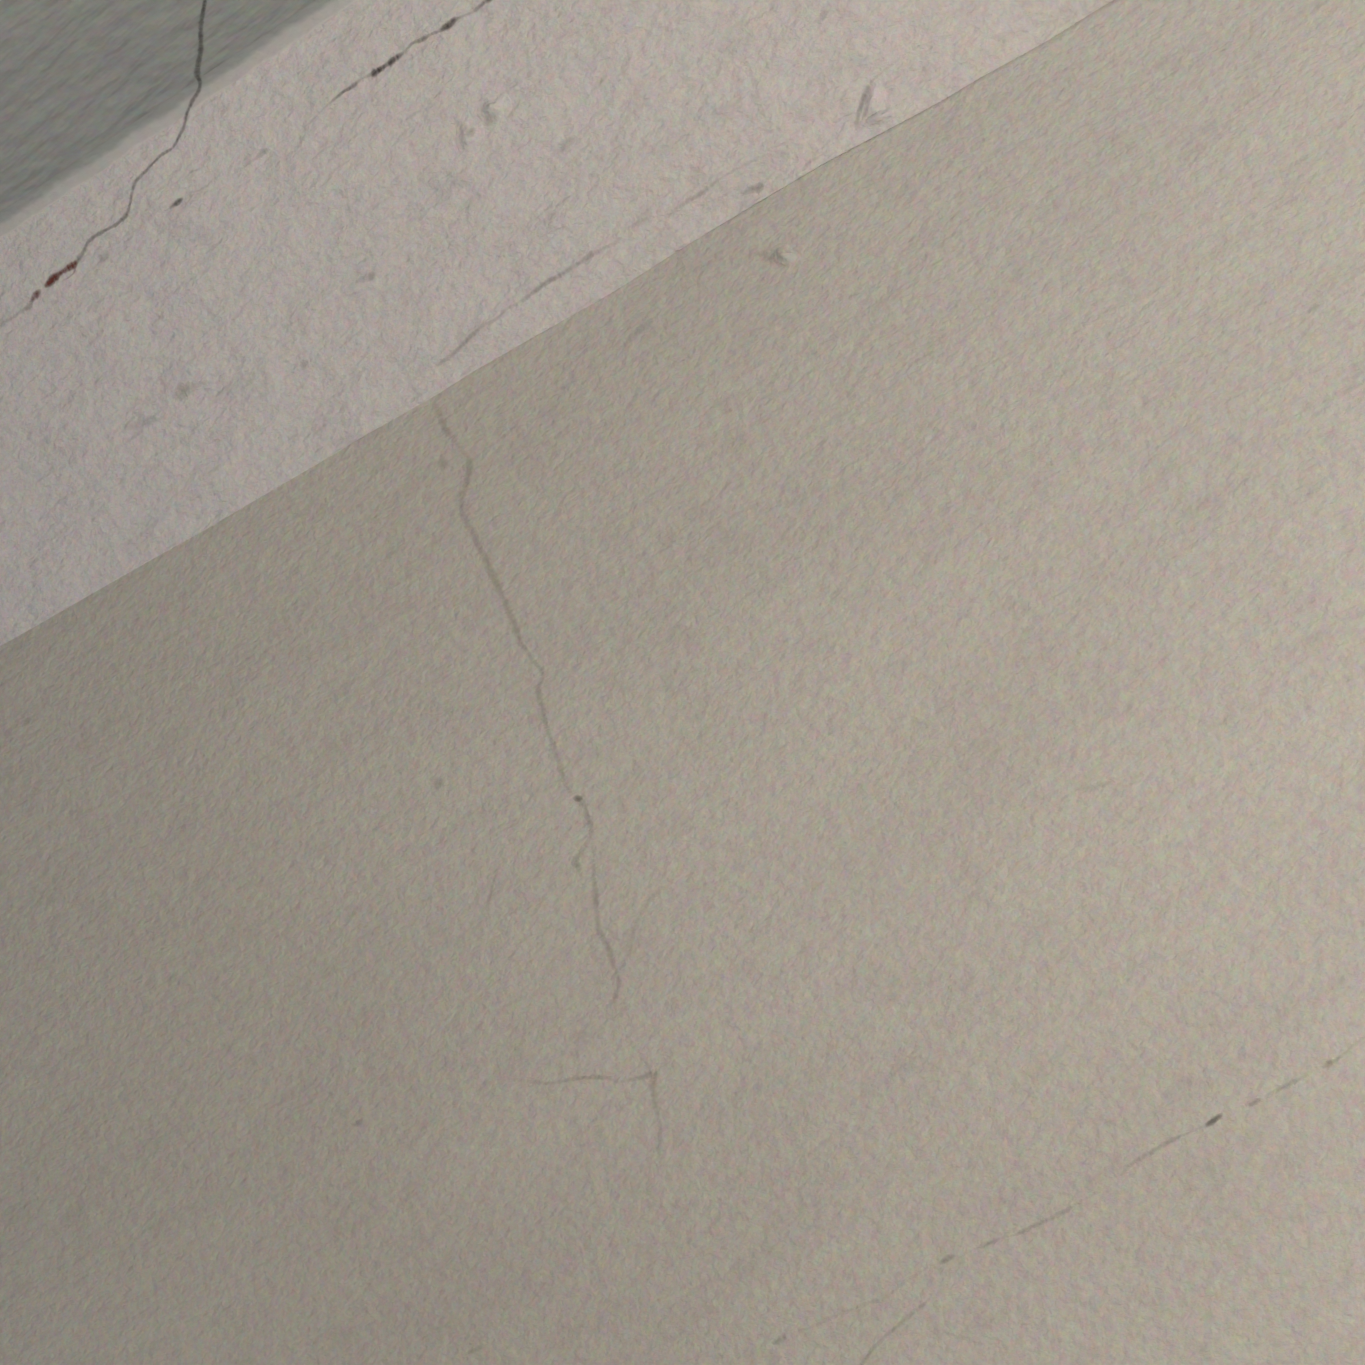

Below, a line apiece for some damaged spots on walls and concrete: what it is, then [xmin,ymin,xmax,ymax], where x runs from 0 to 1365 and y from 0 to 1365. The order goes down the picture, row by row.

crack [372,55,399,76]
crack [33,261,77,299]